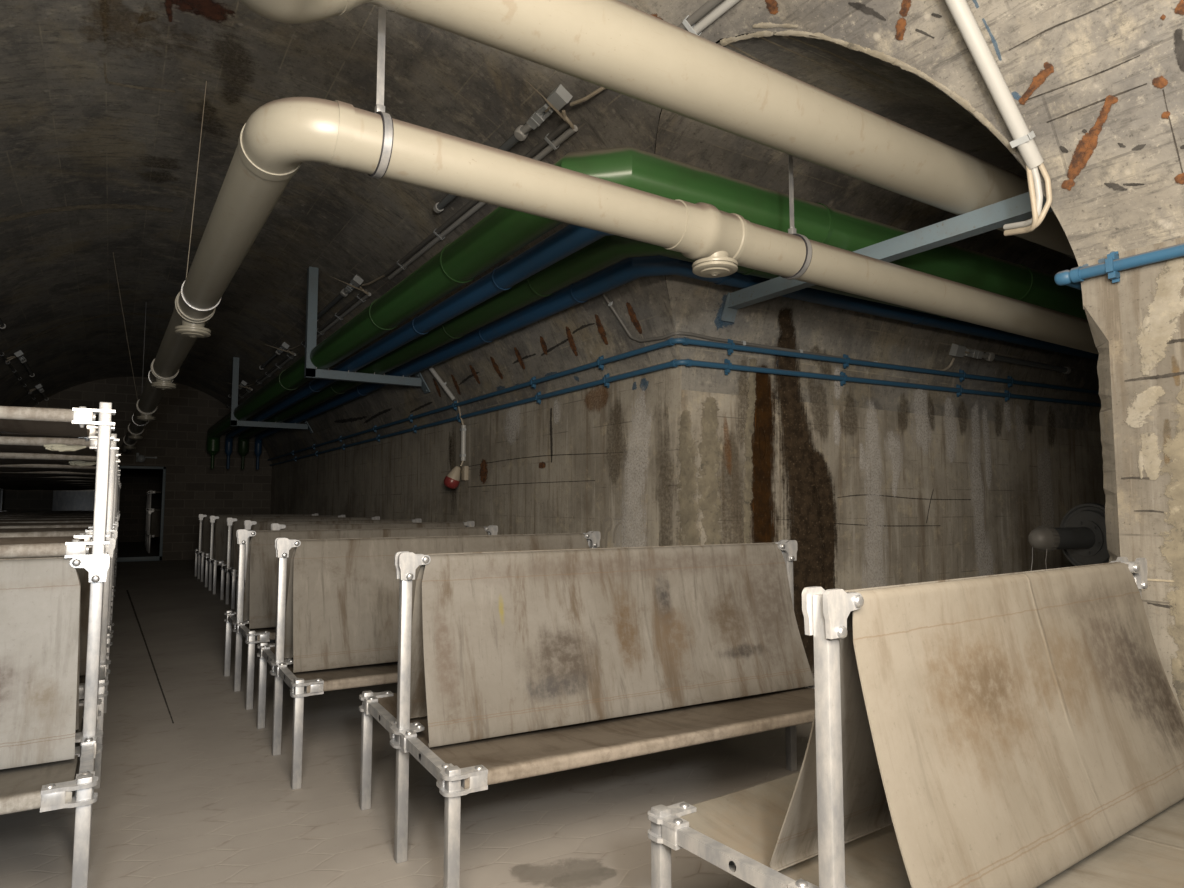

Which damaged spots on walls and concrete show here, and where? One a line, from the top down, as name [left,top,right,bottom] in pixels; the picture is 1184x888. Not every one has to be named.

corrosion [164,0,235,23]
corrosion [765,0,779,15]
corrosion [895,0,912,40]
corrosion [1160,0,1184,20]
corrosion [1018,62,1054,105]
corrosion [1152,76,1168,89]
corrosion [1062,95,1118,191]
corrosion [595,314,608,345]
water stain [720,308,1034,672]
peeling [1125,257,1184,709]
water stain [513,860,615,888]